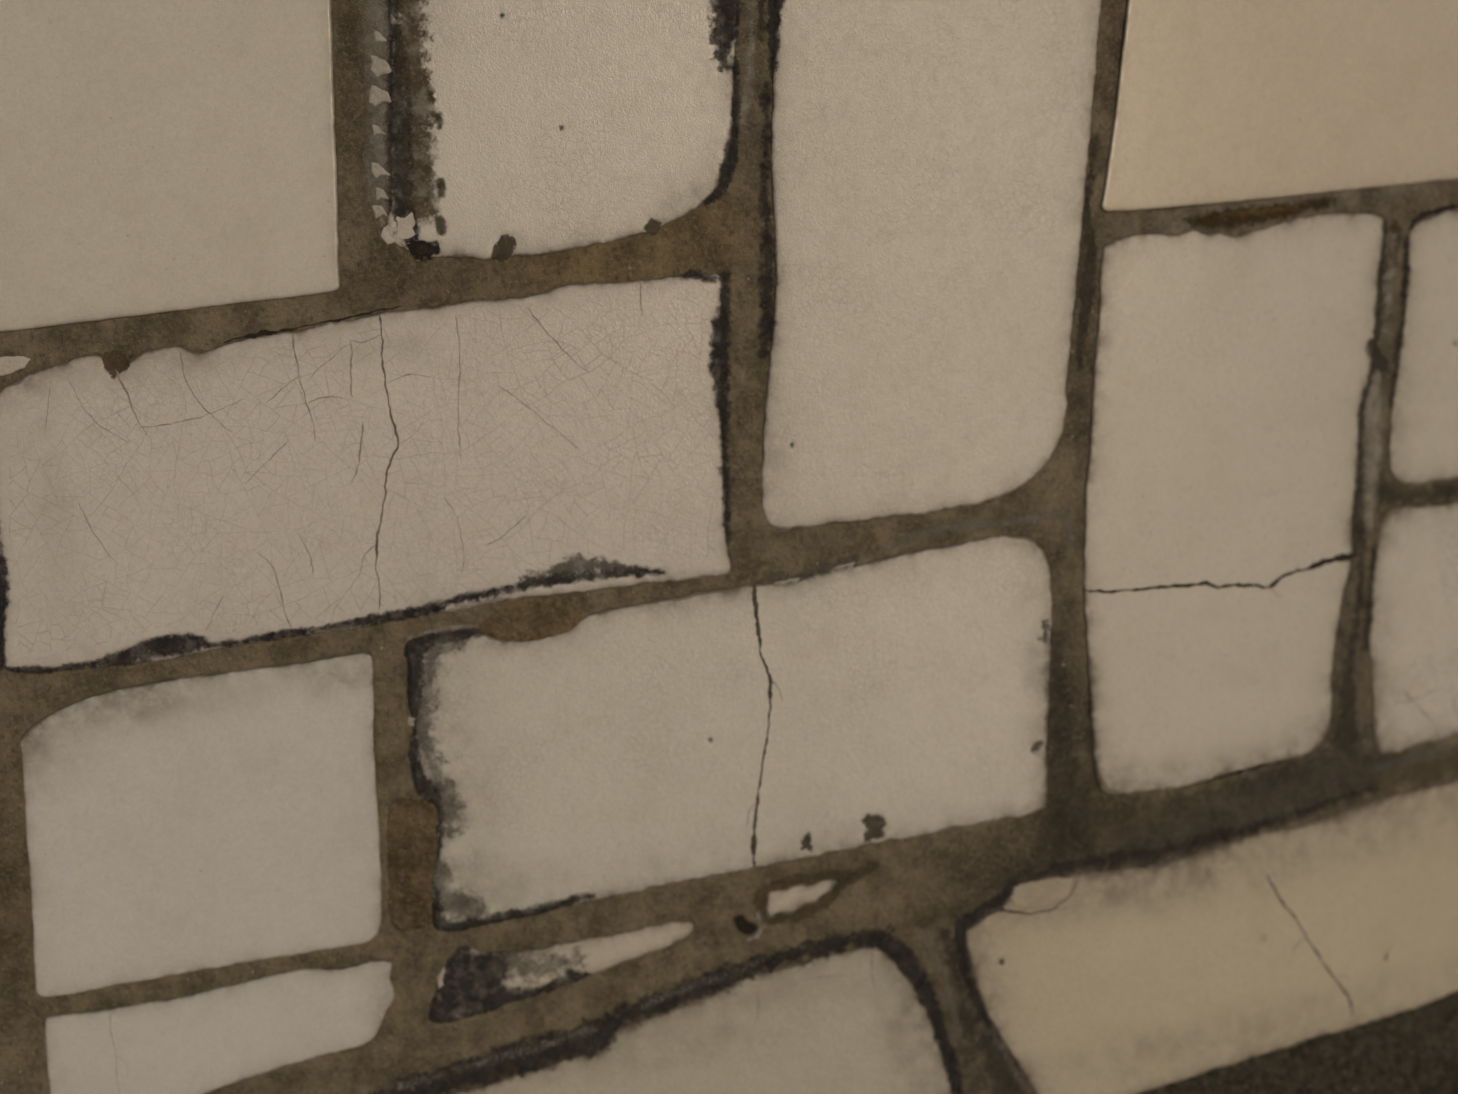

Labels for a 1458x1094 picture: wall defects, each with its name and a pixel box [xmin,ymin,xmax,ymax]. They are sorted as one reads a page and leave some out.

spalling [362,0,446,261]
rust [1187,197,1335,230]
crack [8,283,716,652]
crack [1083,553,1354,597]
spalling [0,532,665,1024]
crack [747,582,783,867]
crack [1266,874,1353,1016]